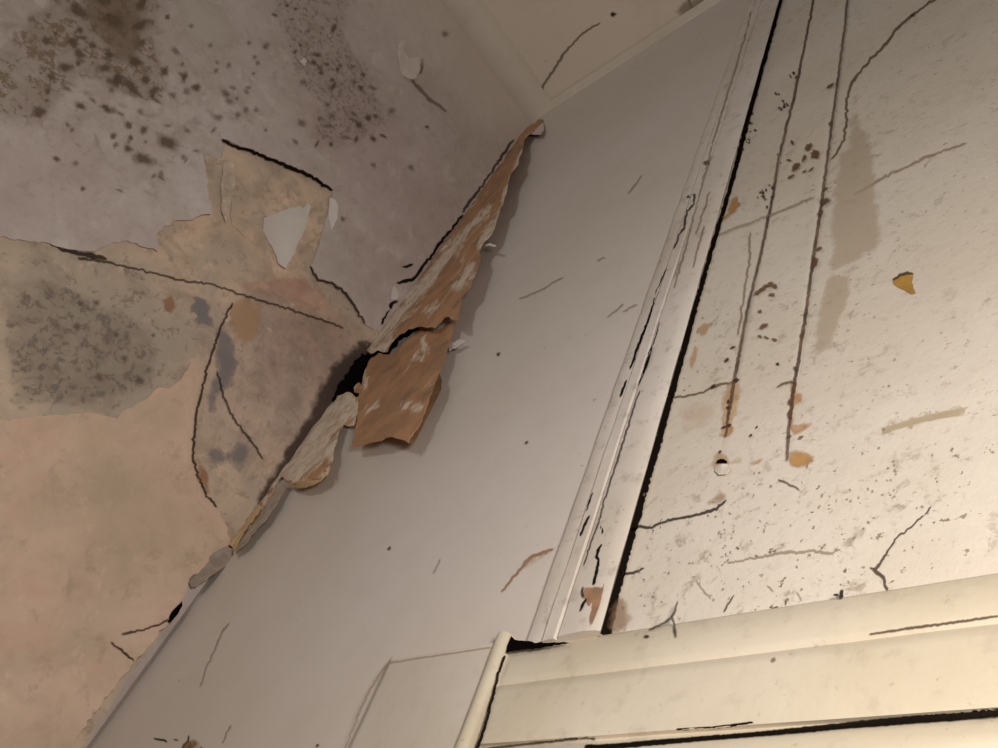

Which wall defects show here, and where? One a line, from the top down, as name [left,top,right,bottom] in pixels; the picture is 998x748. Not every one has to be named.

mould [0,0,169,117]
crack [542,23,599,89]
mould [126,122,151,163]
damp [834,132,877,264]
damp [13,288,151,400]
crack [51,139,514,507]
crack [580,0,935,637]
damp [818,278,847,349]
spalling [893,271,916,294]
peeling [0,124,418,748]
crack [111,619,168,660]
spalling [580,586,604,624]